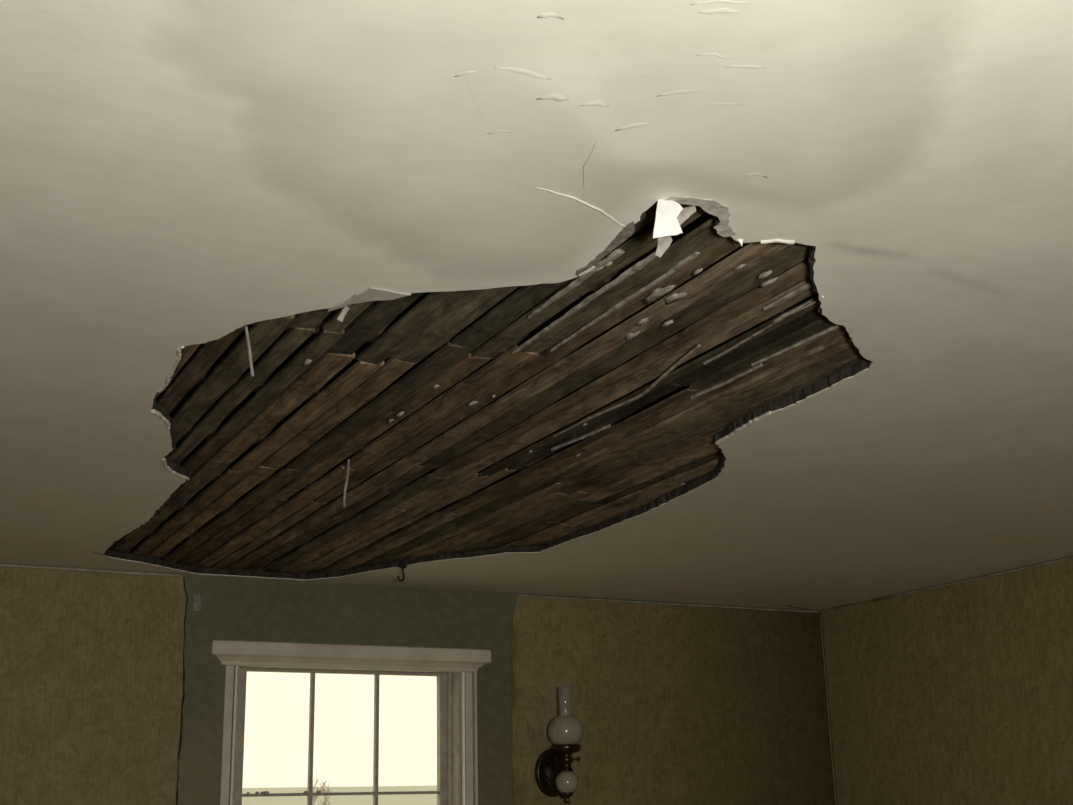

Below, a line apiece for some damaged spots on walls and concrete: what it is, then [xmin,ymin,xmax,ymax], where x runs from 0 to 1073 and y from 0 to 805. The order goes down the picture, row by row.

crack [493,141,625,227]
spalling [512,196,743,355]
spalling [104,245,873,579]